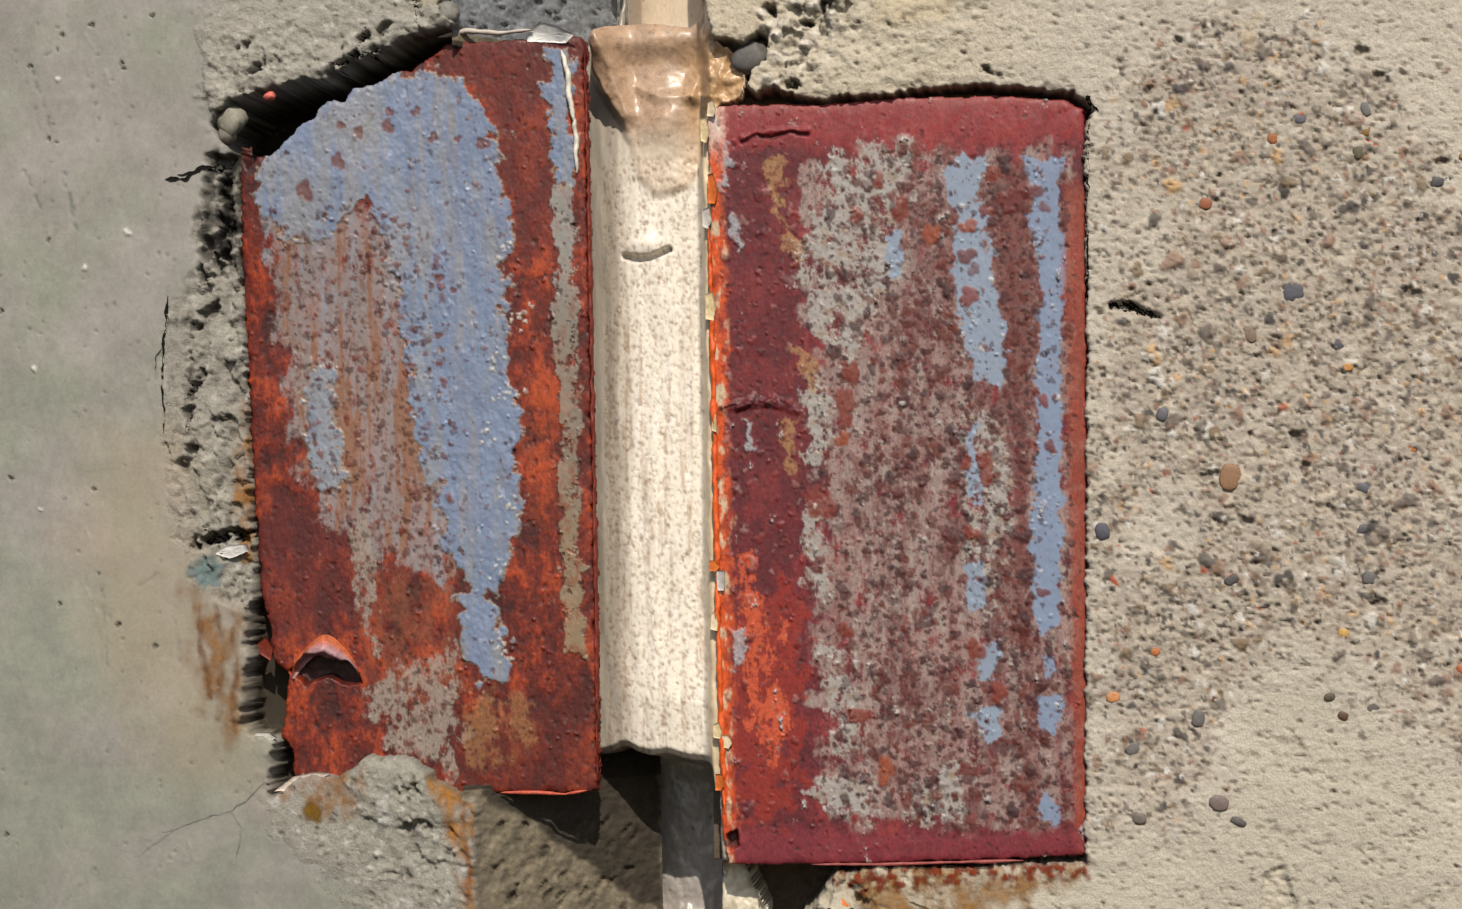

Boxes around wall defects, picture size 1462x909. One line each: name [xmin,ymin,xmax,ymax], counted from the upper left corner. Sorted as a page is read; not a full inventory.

spalling [729,0,990,104]
spalling [159,0,579,609]
corrosion [500,47,600,795]
spalling [1082,0,1462,856]
corrosion [241,529,252,562]
corrosion [709,317,727,826]
corrosion [258,636,274,661]
corrosion [291,635,360,679]
spalling [255,732,277,740]
spalling [256,753,506,909]
corrosion [812,859,1089,909]